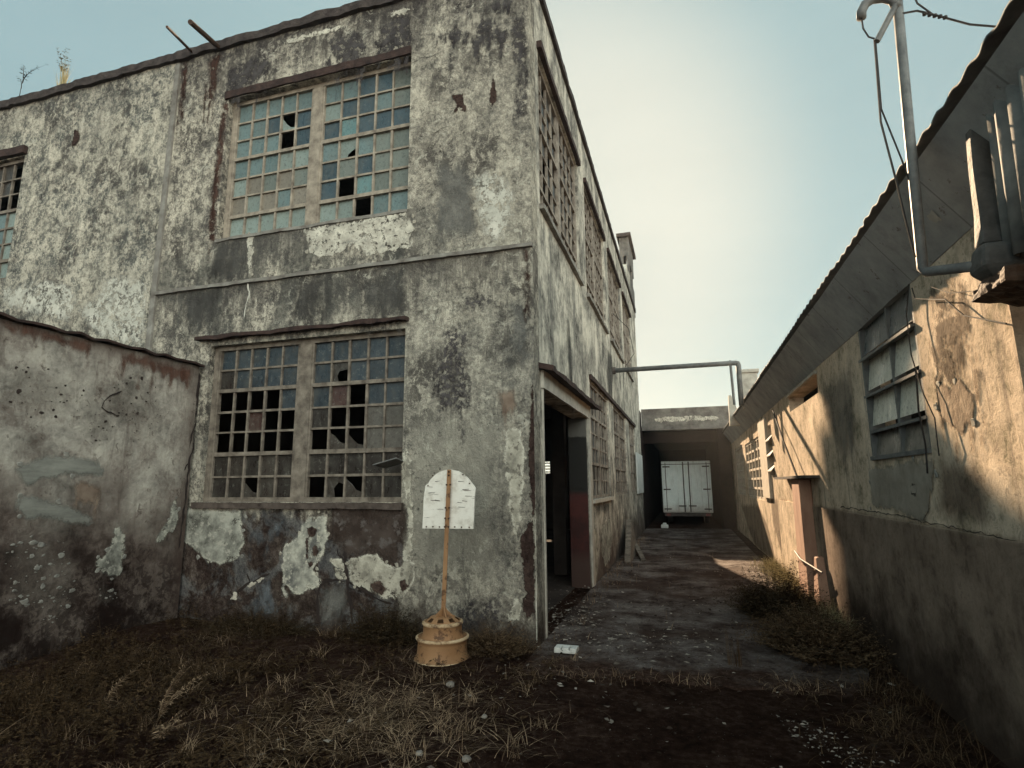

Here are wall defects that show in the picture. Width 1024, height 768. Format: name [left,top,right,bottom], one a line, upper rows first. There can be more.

rust [203,54,229,253]
flaking render [304,212,416,258]
leakage [929,275,981,449]
flaking render [95,526,126,599]
flaking render [156,496,247,564]
flaking render [279,448,420,599]